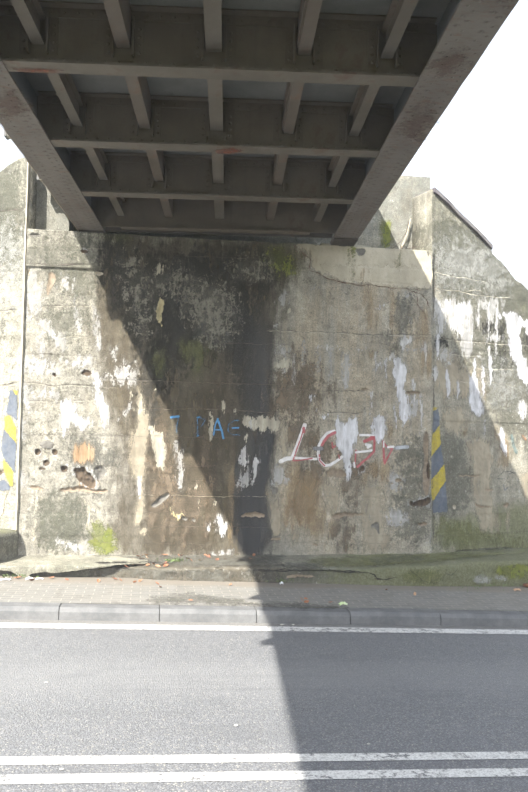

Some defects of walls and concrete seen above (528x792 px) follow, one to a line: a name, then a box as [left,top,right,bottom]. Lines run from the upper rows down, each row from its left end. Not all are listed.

spalling [34,440,108,494]
leakage [21,233,424,582]
crack [282,243,518,418]
leakage [369,291,528,533]
crack [252,568,429,583]